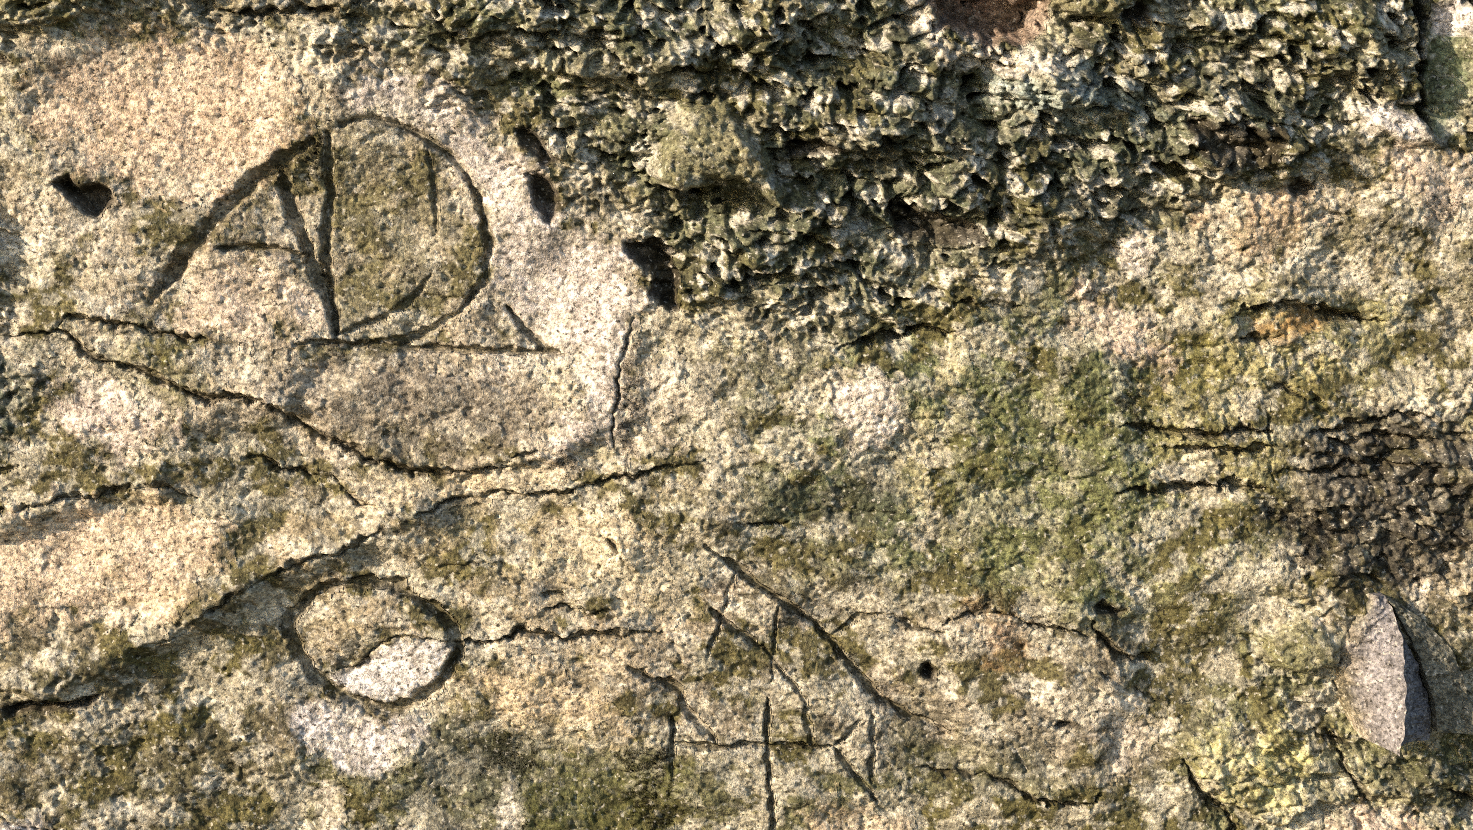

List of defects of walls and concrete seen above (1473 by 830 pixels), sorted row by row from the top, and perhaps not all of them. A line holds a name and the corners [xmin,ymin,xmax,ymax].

crack [59,313,692,615]
crack [462,591,653,647]
crack [353,653,371,668]